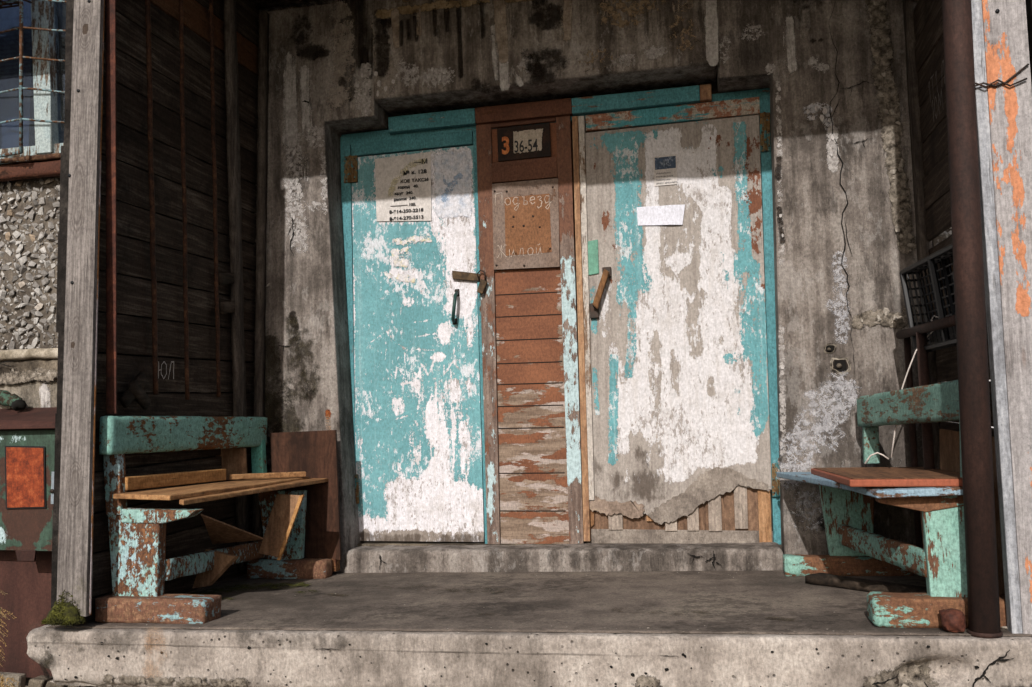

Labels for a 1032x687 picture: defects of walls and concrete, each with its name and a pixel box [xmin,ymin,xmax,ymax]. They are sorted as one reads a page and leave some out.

water stain [291,15,329,61]
water stain [340,0,572,101]
water stain [673,0,765,66]
water stain [765,16,829,75]
spalling [775,81,785,265]
water stain [264,311,319,473]
spalling [778,325,787,487]
crack [872,676,898,687]
crack [972,650,1014,687]